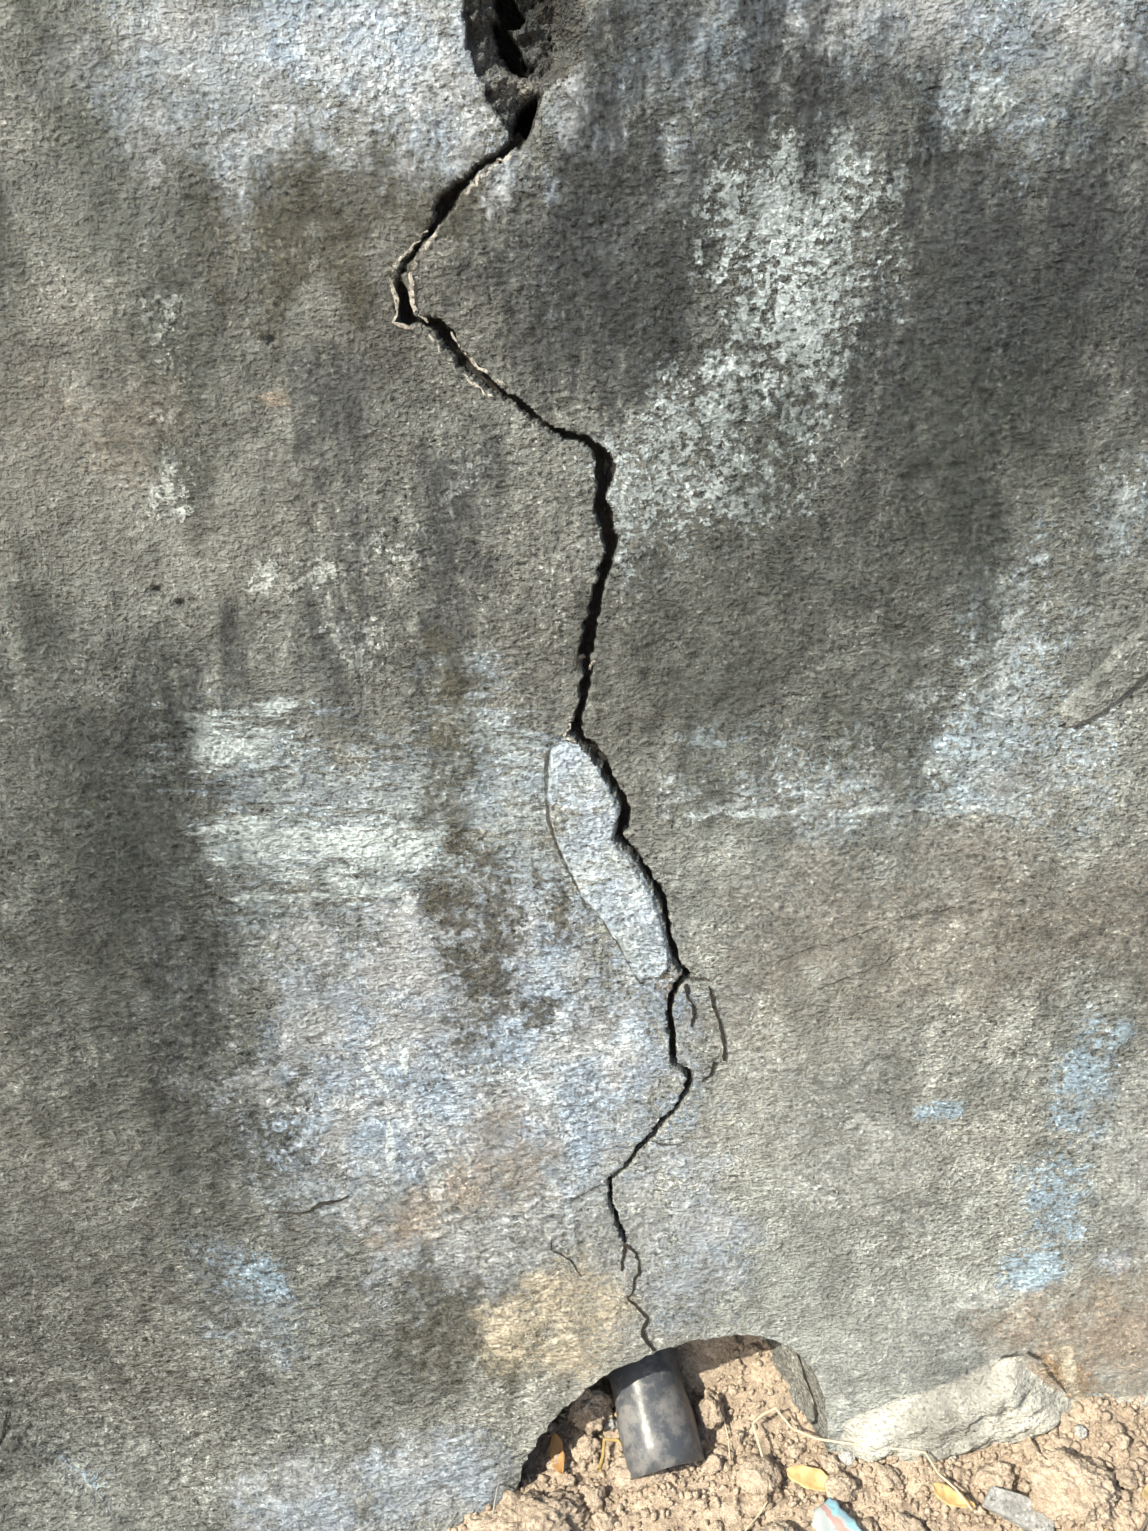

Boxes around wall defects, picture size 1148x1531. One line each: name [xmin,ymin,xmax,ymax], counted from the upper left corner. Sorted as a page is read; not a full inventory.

peeling [48,0,1148,216]
leakage [140,290,200,525]
leakage [247,449,492,600]
leakage [494,0,1148,582]
leakage [318,615,388,671]
crack [389,132,726,1352]